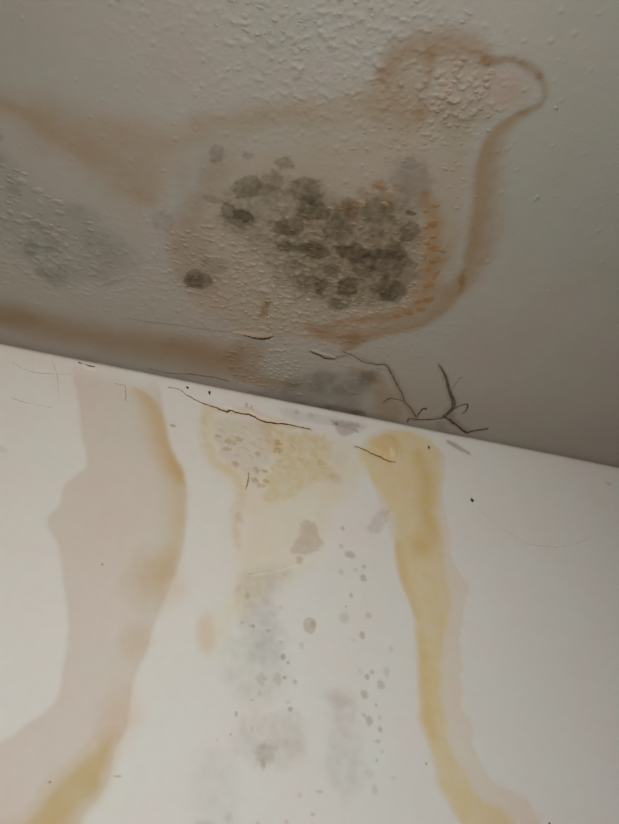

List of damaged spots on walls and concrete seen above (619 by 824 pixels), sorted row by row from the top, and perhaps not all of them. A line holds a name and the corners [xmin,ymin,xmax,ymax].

crack [151,369,314,432]
water stain [0,361,545,824]
water stain [0,9,553,425]